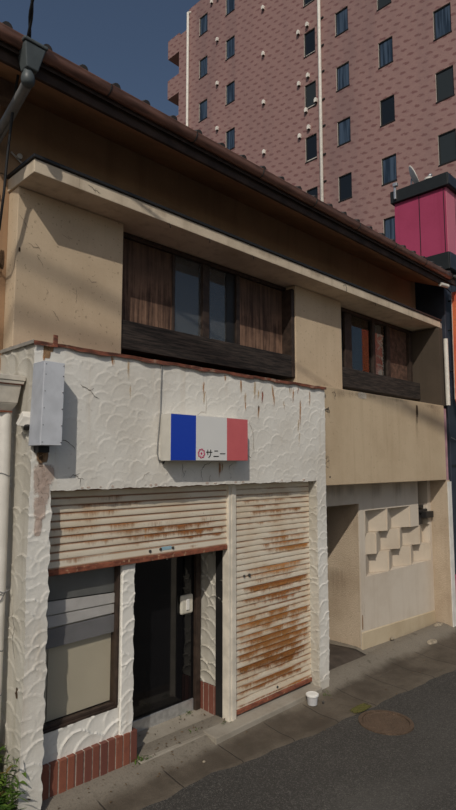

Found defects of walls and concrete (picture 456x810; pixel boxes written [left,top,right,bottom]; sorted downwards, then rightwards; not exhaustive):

rust [104,522,222,544]
rust [264,530,307,550]
rust [238,560,308,706]